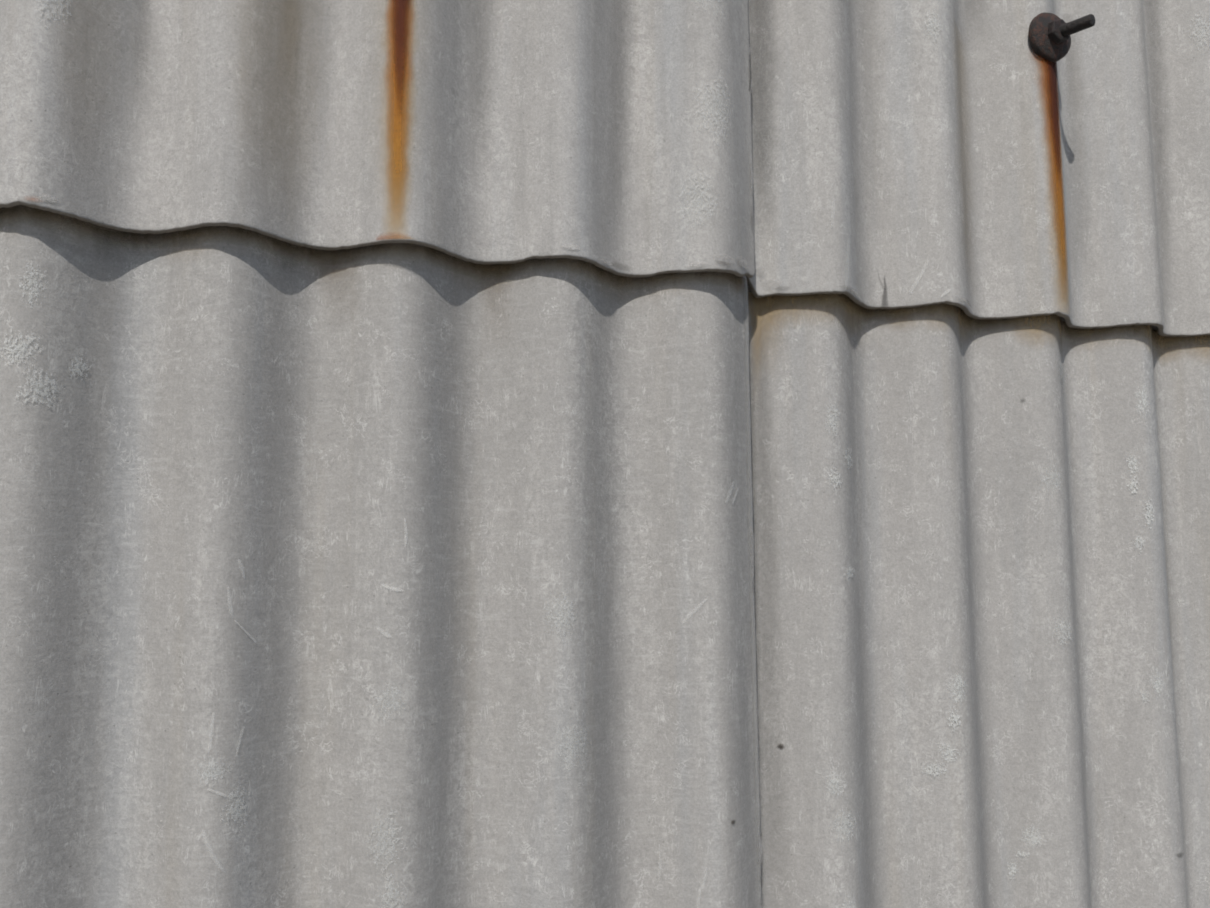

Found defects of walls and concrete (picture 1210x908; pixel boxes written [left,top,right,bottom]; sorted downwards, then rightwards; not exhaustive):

corrosion [390,0,408,190]
corrosion [1041,57,1066,269]